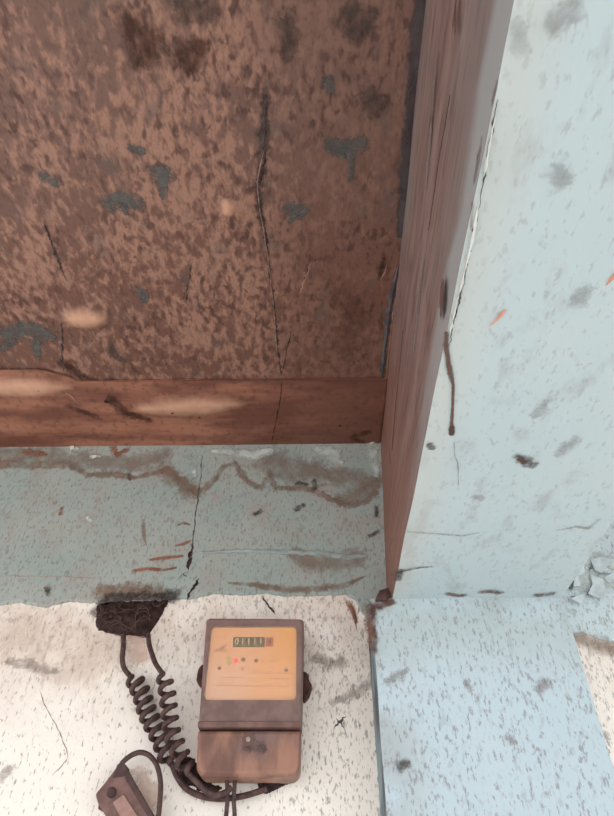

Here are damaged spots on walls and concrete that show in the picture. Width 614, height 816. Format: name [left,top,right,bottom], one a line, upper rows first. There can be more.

damp [124,14,164,68]
peeling [100,191,145,215]
peeling [149,164,173,199]
crack [449,100,498,345]
crack [44,224,65,277]
crack [101,93,377,440]
corrosion [443,331,455,436]
damp [0,450,379,517]
crack [179,457,203,602]
damp [97,582,162,598]
peeling [570,552,614,604]
corrosion [346,599,394,652]